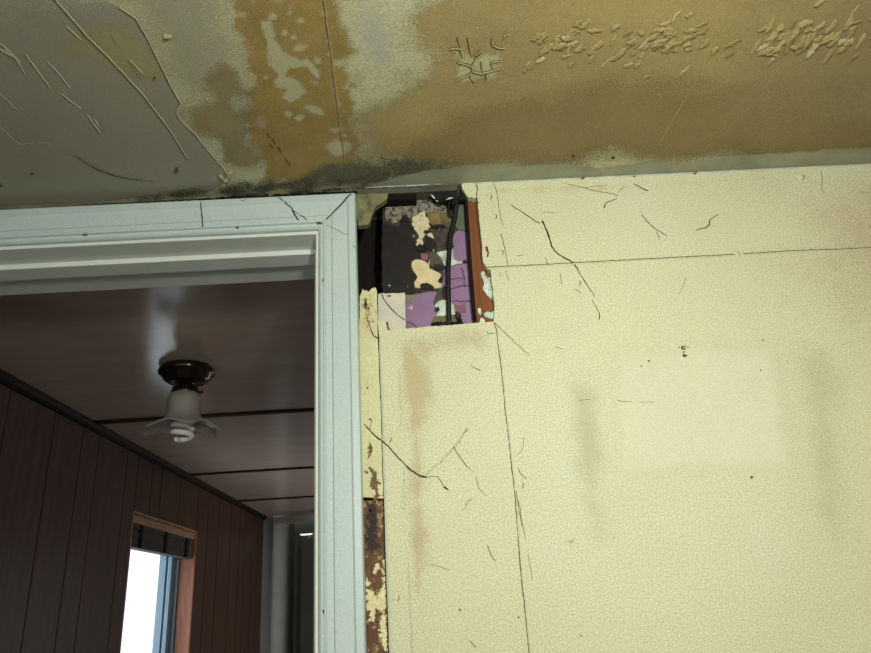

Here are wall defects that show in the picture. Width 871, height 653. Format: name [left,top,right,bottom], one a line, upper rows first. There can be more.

leakage [0,0,871,202]
crack [75,191,357,235]
spalling [357,200,466,323]
crack [451,262,471,302]
flaking render [478,271,494,323]
crack [476,182,871,320]
crack [364,294,449,653]
crack [486,322,532,653]
peeling [365,559,388,651]